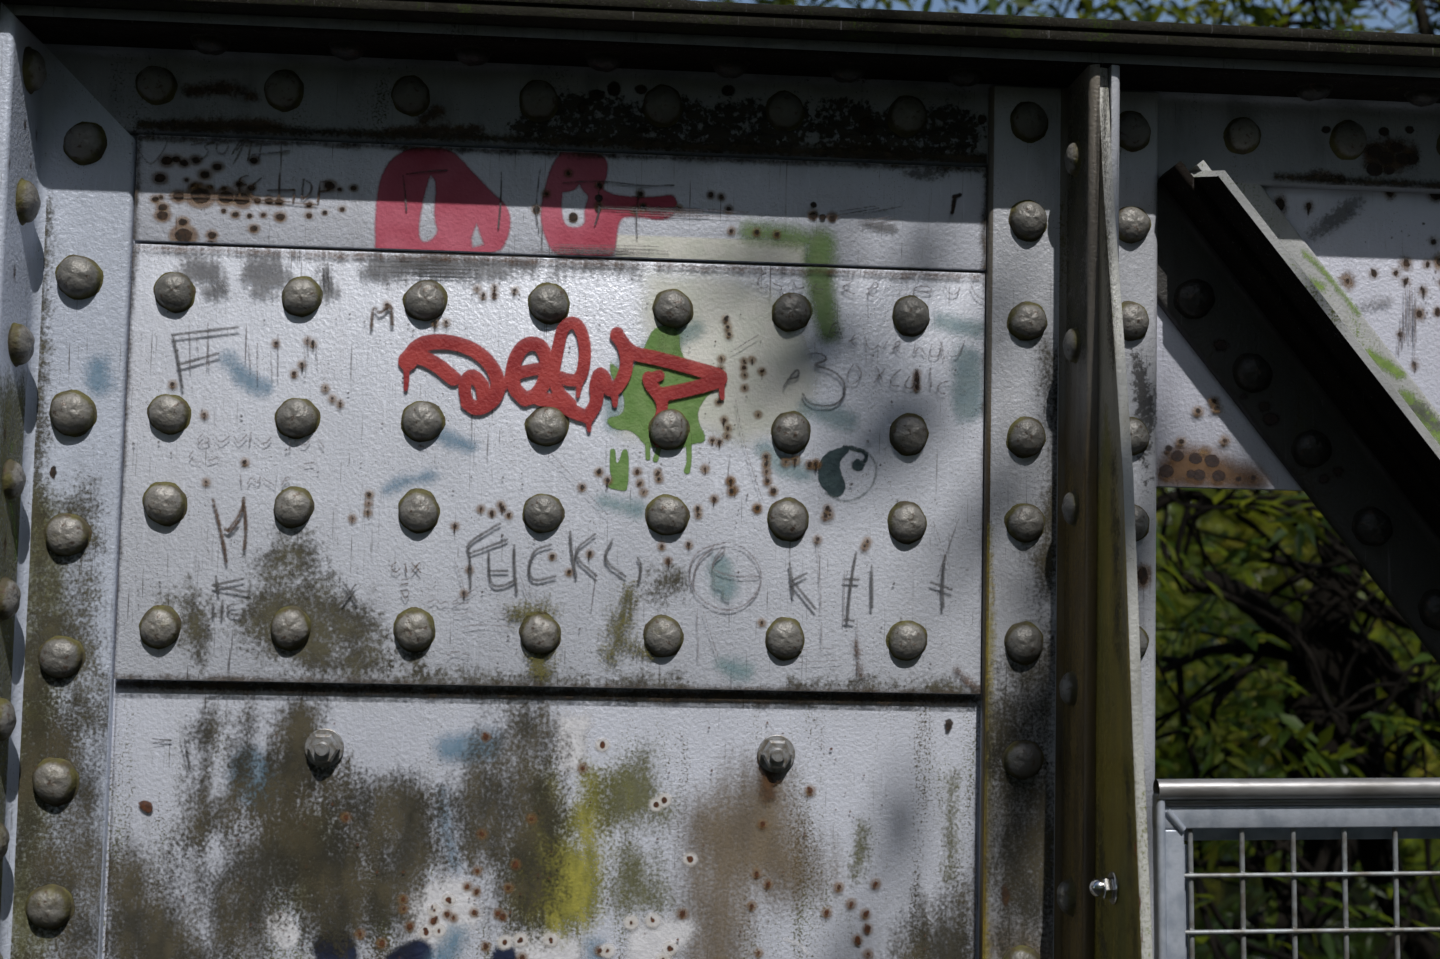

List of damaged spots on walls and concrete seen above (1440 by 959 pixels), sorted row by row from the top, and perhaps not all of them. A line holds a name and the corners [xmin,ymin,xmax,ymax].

corrosion [1394,222,1440,319]
corrosion [713,314,765,391]
corrosion [634,452,662,495]
corrosion [699,399,735,473]
corrosion [695,453,820,524]
corrosion [1158,436,1267,488]
leakage [10,197,688,959]
leakage [788,674,898,692]
leakage [890,621,1056,959]
leakage [687,768,820,959]
leakage [851,824,869,878]
corrosion [400,867,557,959]